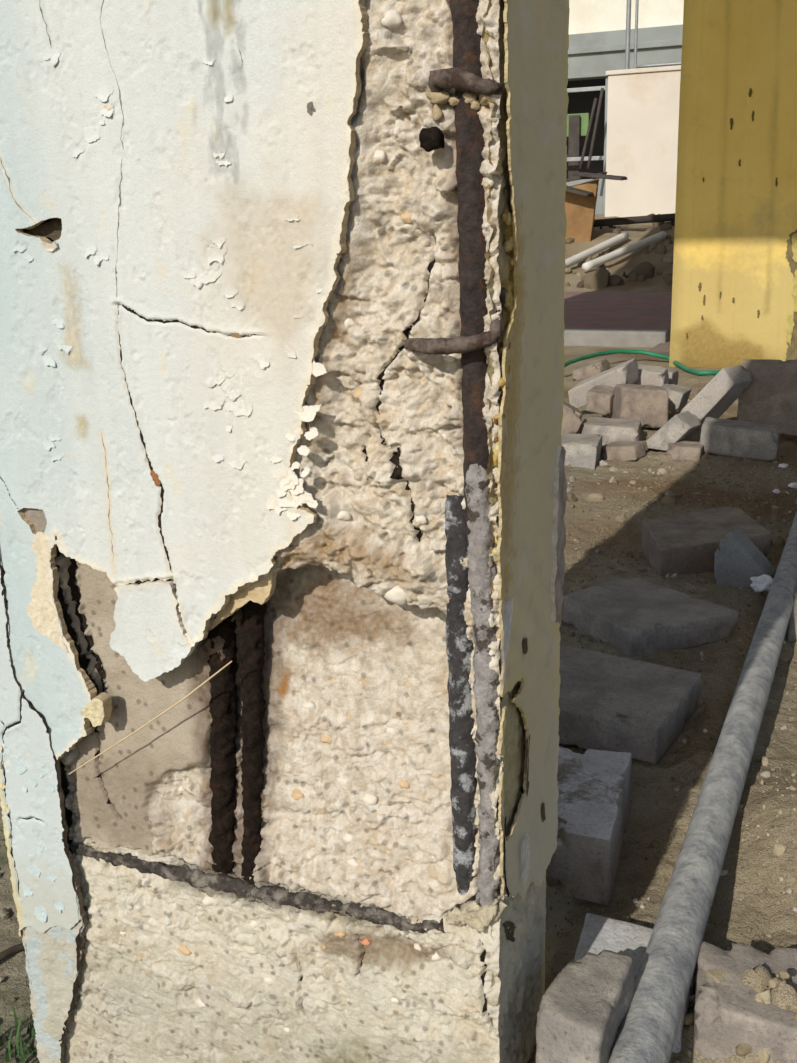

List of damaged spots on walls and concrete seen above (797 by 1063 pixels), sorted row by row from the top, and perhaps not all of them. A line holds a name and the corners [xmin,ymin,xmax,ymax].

peeling [785,230,797,361]
crack [362,236,436,542]
spalling [12,0,530,1063]
flaking render [550,446,568,624]
crack [67,559,106,693]
crack [94,726,111,804]